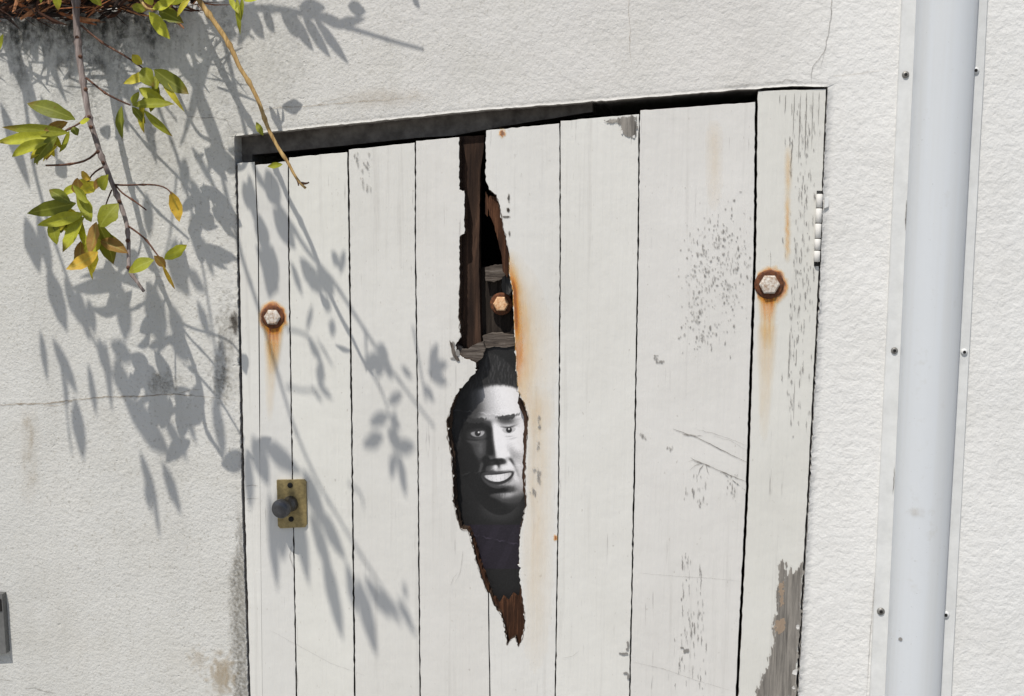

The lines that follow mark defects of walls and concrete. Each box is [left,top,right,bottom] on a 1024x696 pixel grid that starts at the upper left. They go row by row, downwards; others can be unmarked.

peeling [604,115,638,138]
corrosion [757,268,787,320]
corrosion [260,302,286,350]
corrosion [510,272,523,371]
peeling [755,559,804,696]